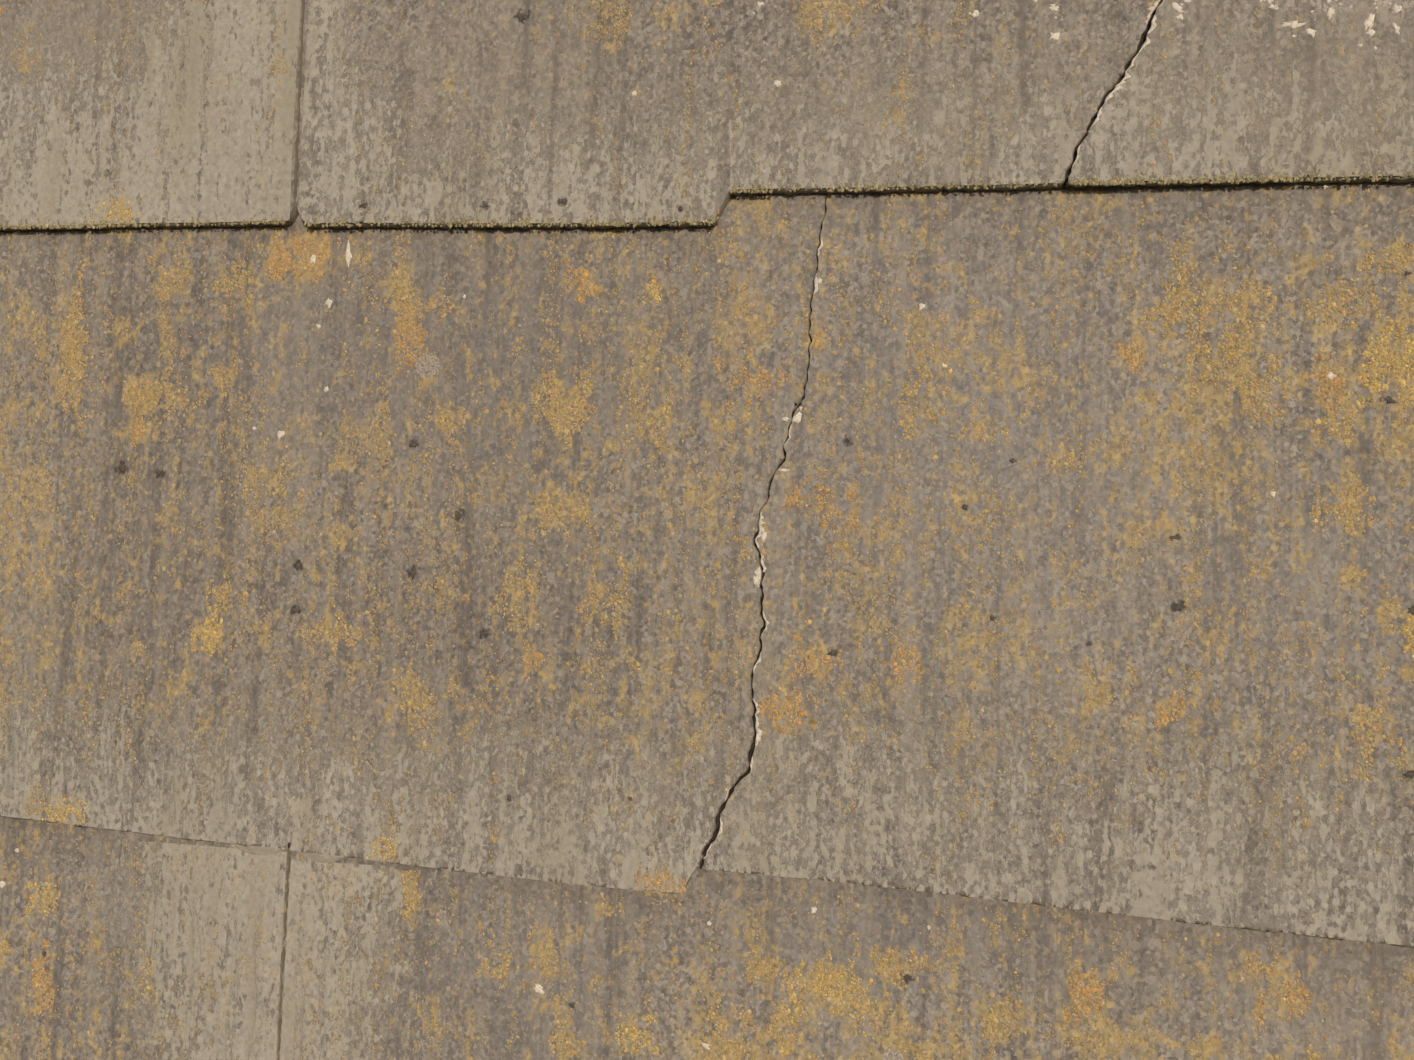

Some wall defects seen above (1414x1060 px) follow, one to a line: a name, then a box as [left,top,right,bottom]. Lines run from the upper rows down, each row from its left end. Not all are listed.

crack [1060,0,1164,187]
crack [700,205,826,868]